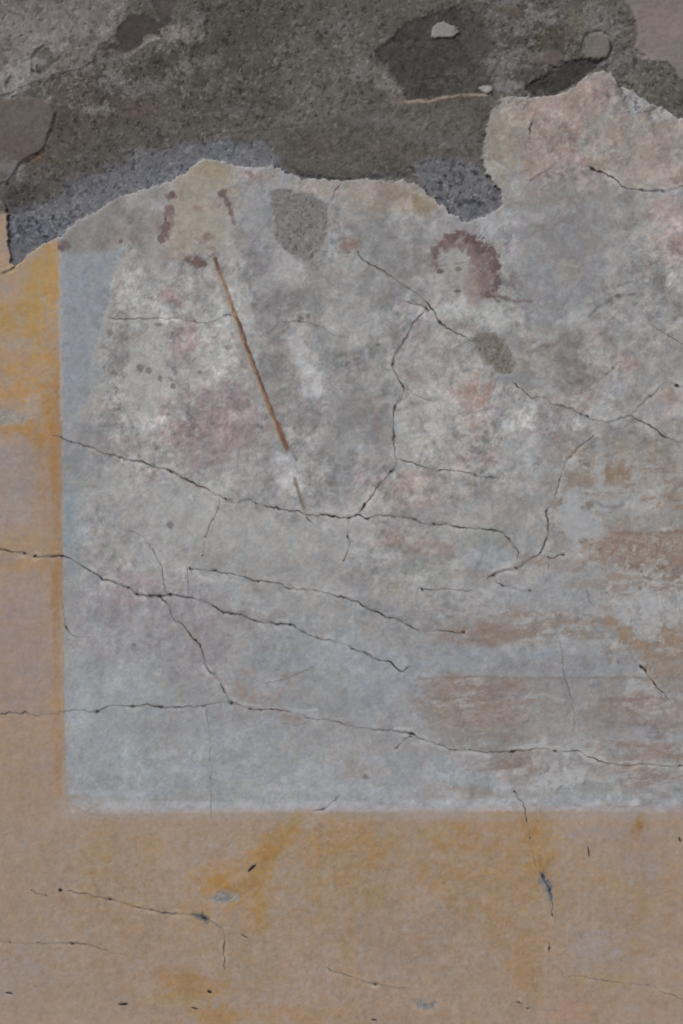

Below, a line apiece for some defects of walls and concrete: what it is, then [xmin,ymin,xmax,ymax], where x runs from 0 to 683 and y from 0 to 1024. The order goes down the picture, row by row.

flaking render [0,0,683,265]
crack [0,249,683,818]
crack [0,940,127,956]
crack [30,889,226,970]
crack [513,790,683,1000]